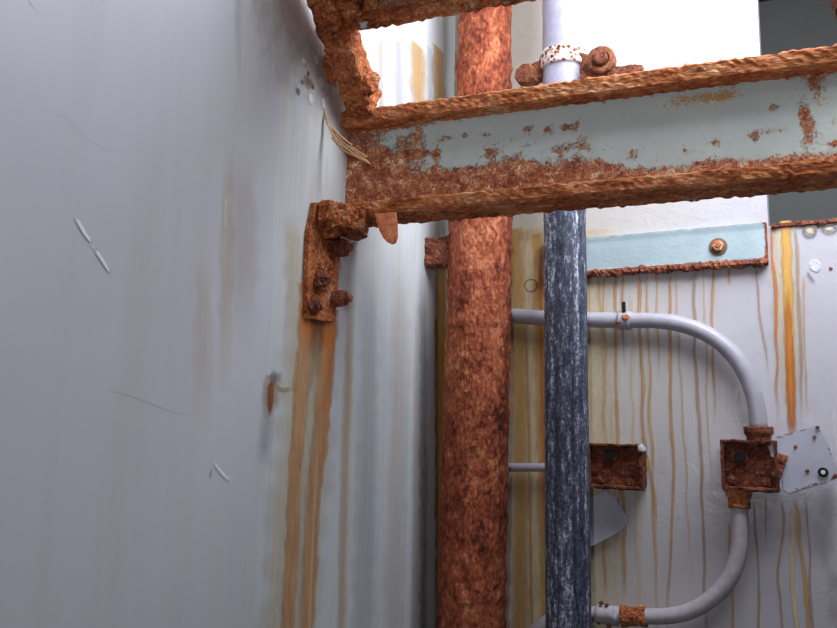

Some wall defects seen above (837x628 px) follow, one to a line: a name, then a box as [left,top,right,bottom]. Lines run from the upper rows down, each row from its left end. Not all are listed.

rust [414,42,423,102]
rust [435,46,444,99]
rust [266,282,337,628]
rust [435,269,447,599]
rust [511,226,544,310]
rust [512,323,545,628]
rust [632,328,659,556]
rust [587,220,805,444]
rust [693,337,705,579]
rust [753,507,766,628]
rust [777,505,814,628]